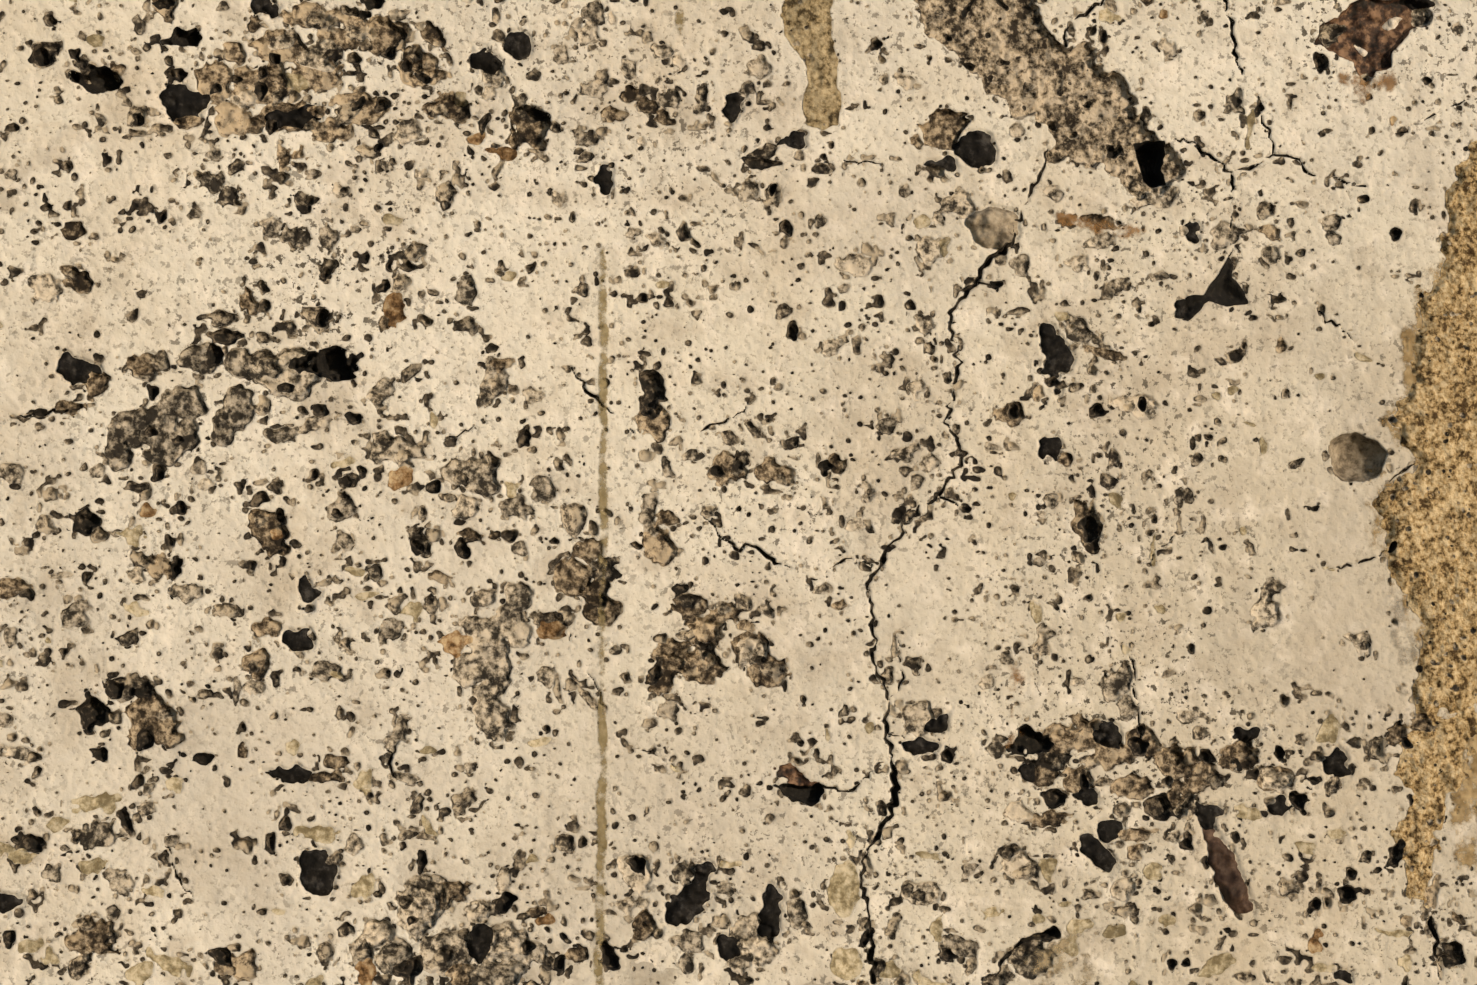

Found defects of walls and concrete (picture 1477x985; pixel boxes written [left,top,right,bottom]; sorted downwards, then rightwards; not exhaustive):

spalling [22,10,62,30]
spalling [720,7,735,17]
spalling [1245,0,1291,34]
rust [1339,73,1396,102]
crack [1174,0,1367,257]
spalling [1366,4,1477,245]
spalling [3,317,48,340]
spalling [69,288,147,338]
spalling [1286,502,1339,574]
crack [701,129,1058,985]
spalling [539,725,559,737]
spalling [277,873,298,897]